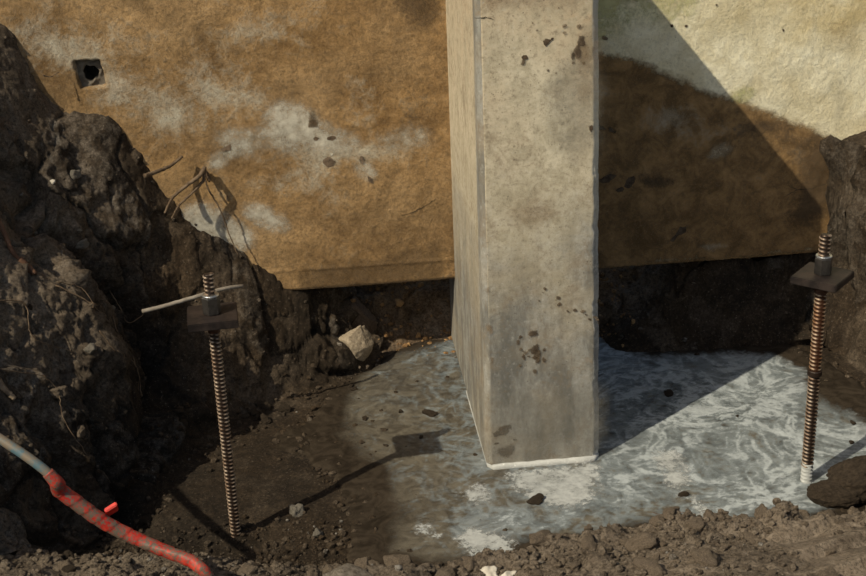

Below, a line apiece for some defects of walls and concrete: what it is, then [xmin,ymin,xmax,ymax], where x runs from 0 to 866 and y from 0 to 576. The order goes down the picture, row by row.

damp [261,105,346,149]
damp [185,205,250,249]
damp [246,206,282,228]